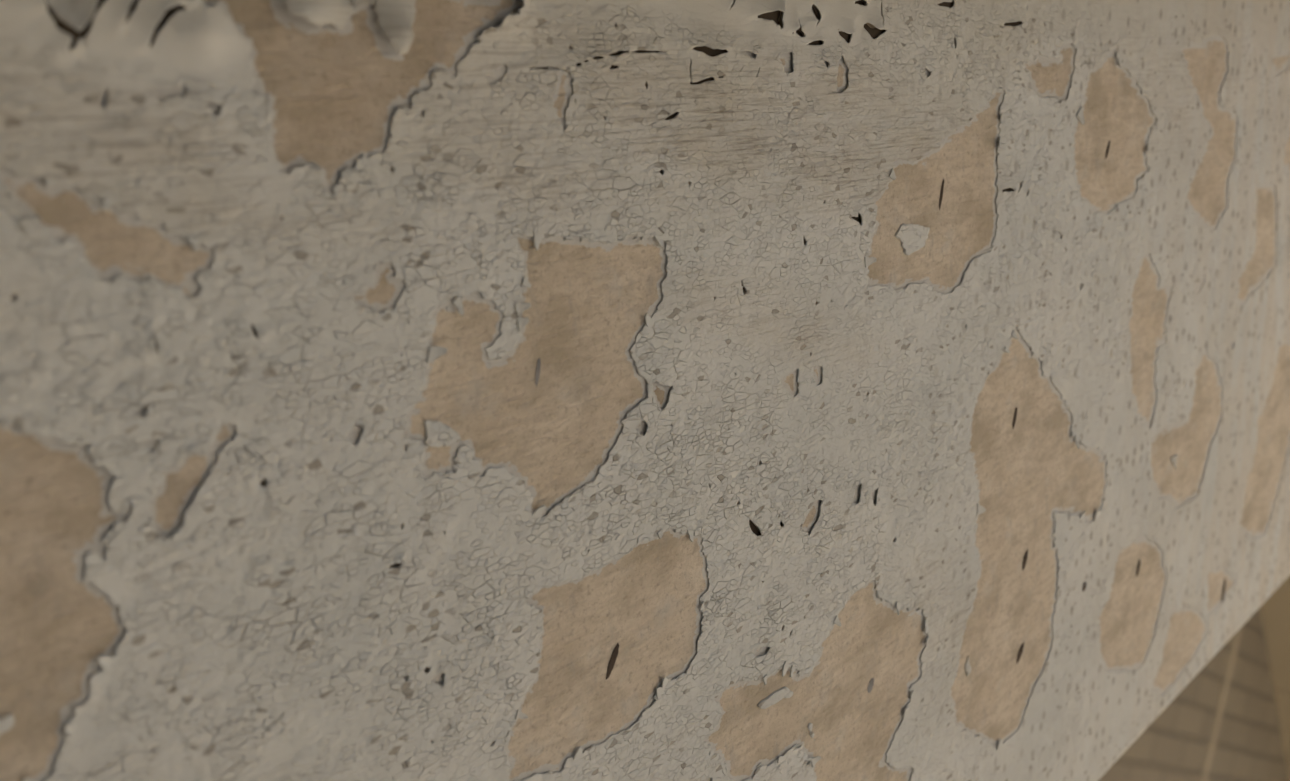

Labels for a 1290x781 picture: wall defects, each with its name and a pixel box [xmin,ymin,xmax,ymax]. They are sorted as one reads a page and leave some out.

peeling [0,166,214,298]
peeling [149,0,524,195]
peeling [780,52,793,73]
peeling [864,87,1005,294]
peeling [1023,43,1156,214]
peeling [403,231,672,518]
peeling [0,421,132,781]
peeling [149,422,236,541]
peeling [504,529,709,781]
peeling [703,581,929,781]
peeling [950,328,1106,750]
peeling [1097,534,1235,695]